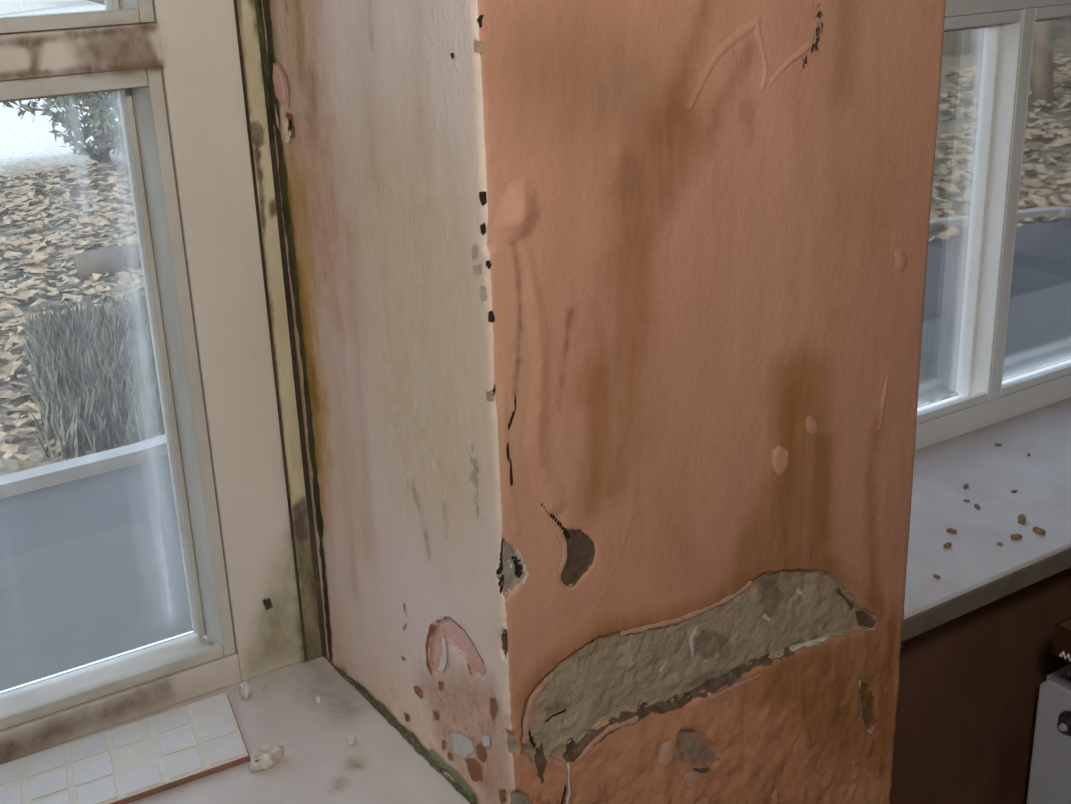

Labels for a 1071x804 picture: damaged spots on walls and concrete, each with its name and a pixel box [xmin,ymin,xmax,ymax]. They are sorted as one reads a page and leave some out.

peeling [800,5,823,72]
water stain [252,0,334,661]
spalling [496,538,529,598]
peeling [556,530,567,575]
peeling [425,617,485,677]
spalling [507,570,876,787]